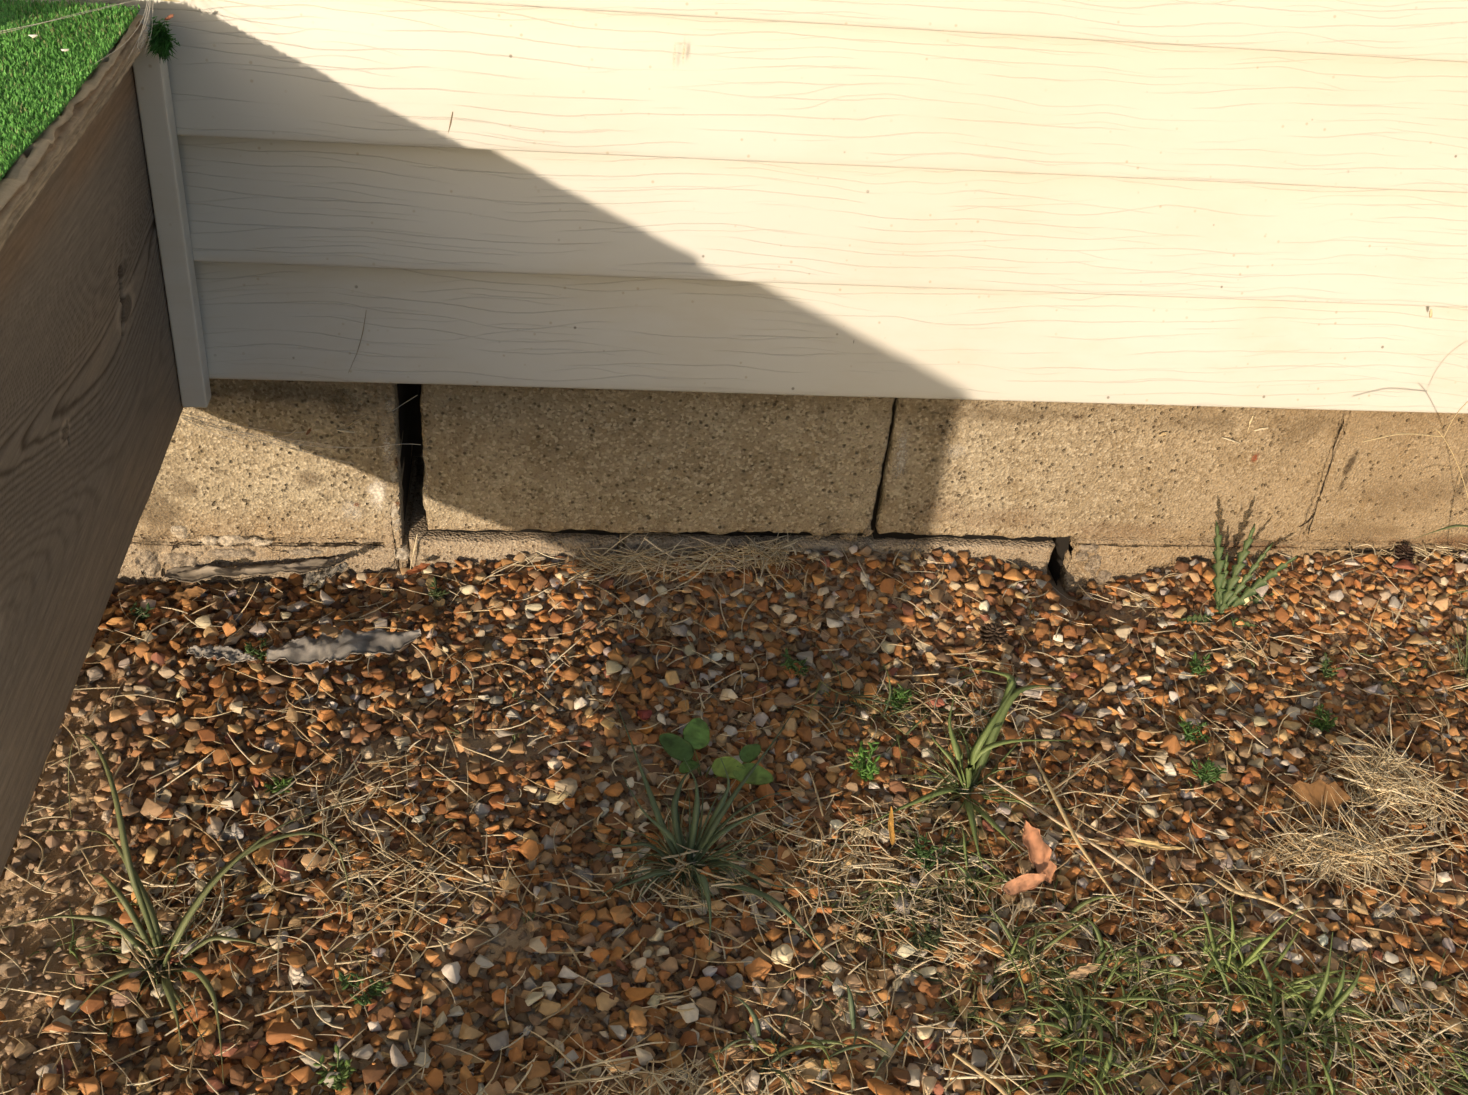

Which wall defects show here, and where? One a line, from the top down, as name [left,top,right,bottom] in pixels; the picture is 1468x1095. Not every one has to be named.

crack [1078,422,1467,553]